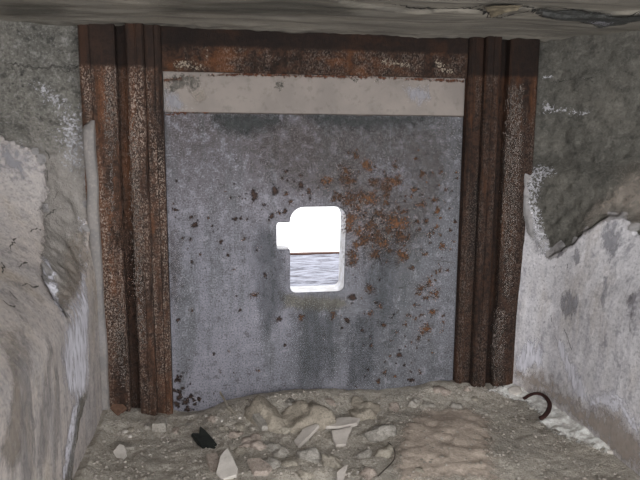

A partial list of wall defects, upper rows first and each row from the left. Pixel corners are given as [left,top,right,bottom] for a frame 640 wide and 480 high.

crack [392,4,639,19]
corrosion [211,72,464,83]
spalling [0,20,90,317]
corrosion [268,184,293,221]
corrosion [281,149,458,270]
spalling [500,9,640,301]
corrosion [413,257,449,307]
corrosion [376,310,445,384]
peeling [492,308,508,385]